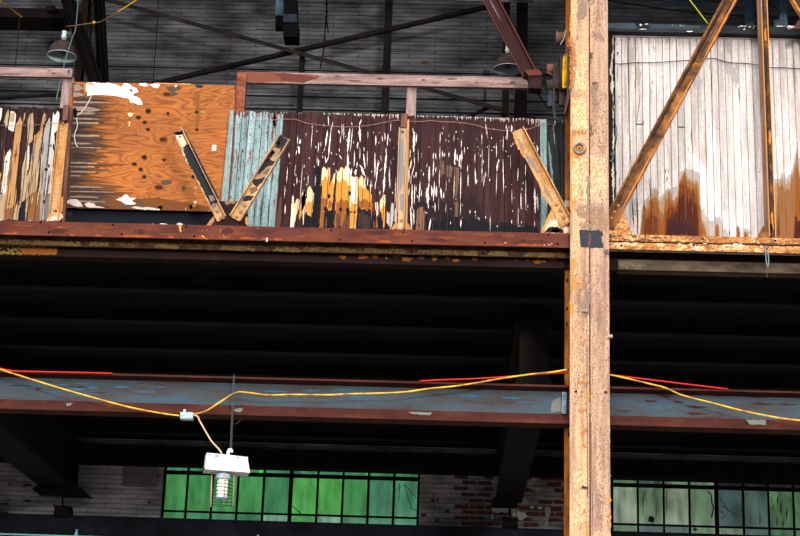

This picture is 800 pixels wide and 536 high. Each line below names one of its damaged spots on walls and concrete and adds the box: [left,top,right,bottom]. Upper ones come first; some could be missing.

peeling [67,199,105,208]
peeling [116,194,160,210]
peeling [86,82,191,126]
peeling [272,118,396,229]
rust [196,216,478,262]
peeling [408,131,484,230]
rust [567,14,577,107]
rust [570,93,608,168]
rust [609,155,800,245]
rust [566,257,611,415]
rust [580,422,612,536]